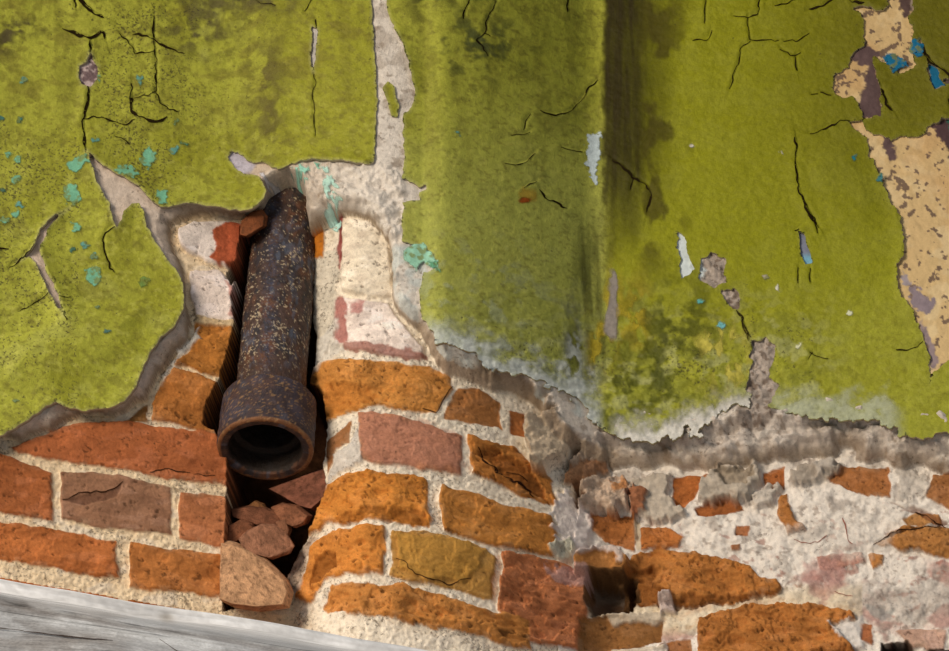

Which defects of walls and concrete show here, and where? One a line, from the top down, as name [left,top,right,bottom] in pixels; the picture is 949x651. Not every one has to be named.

crack [62,0,185,150]
spalling [584,132,602,185]
leakage [602,0,645,204]
crack [729,0,864,89]
crack [794,120,850,233]
peeling [833,0,949,377]
crack [102,226,115,272]
spalling [0,0,585,651]
leakage [433,328,597,423]
efflorescence [616,397,750,444]
spalling [677,233,740,309]
spalling [560,337,949,651]